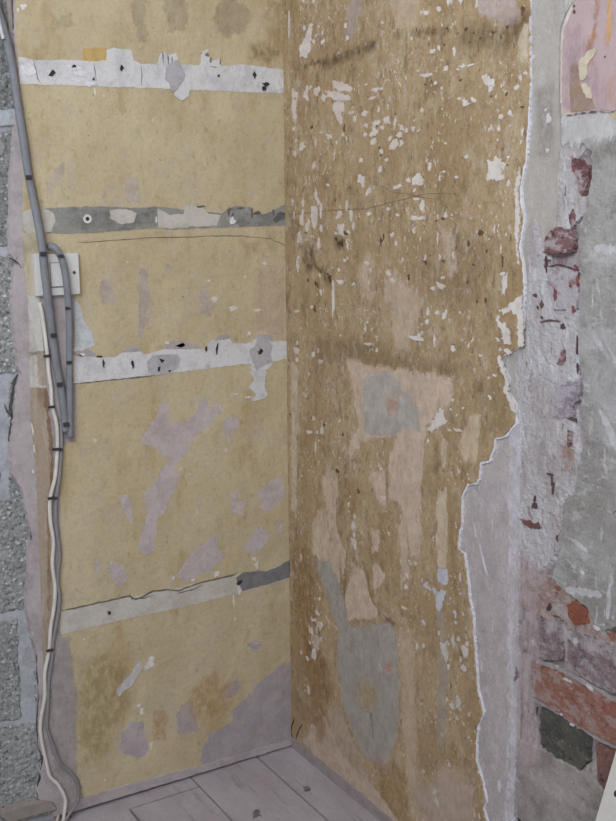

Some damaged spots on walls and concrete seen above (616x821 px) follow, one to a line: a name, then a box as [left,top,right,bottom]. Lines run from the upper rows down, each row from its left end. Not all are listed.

peeling [299,23,325,58]
peeling [560,1,597,112]
peeling [307,200,371,319]
peeling [291,79,420,173]
peeling [393,162,453,233]
peeling [486,156,521,265]
flaking render [533,209,581,329]
flaking render [571,157,592,196]
peeling [487,245,525,413]
flaking render [553,335,584,474]
crack [62,574,236,611]
flaking render [514,563,616,790]